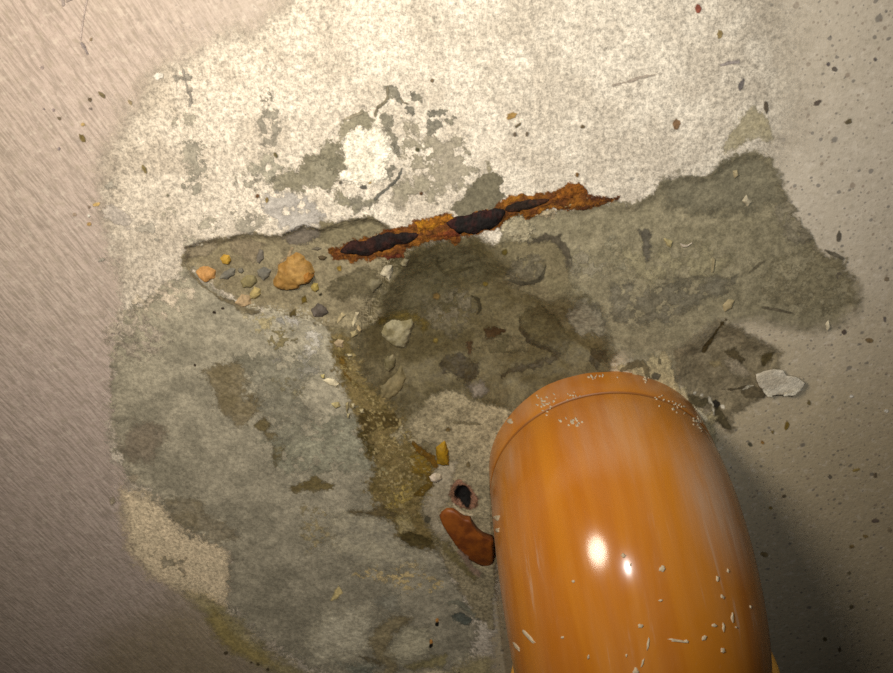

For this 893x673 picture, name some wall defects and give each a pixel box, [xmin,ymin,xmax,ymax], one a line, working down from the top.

peeling [171,73,196,127]
peeling [88,203,159,241]
corrosion [328,182,620,264]
spalling [176,85,863,445]